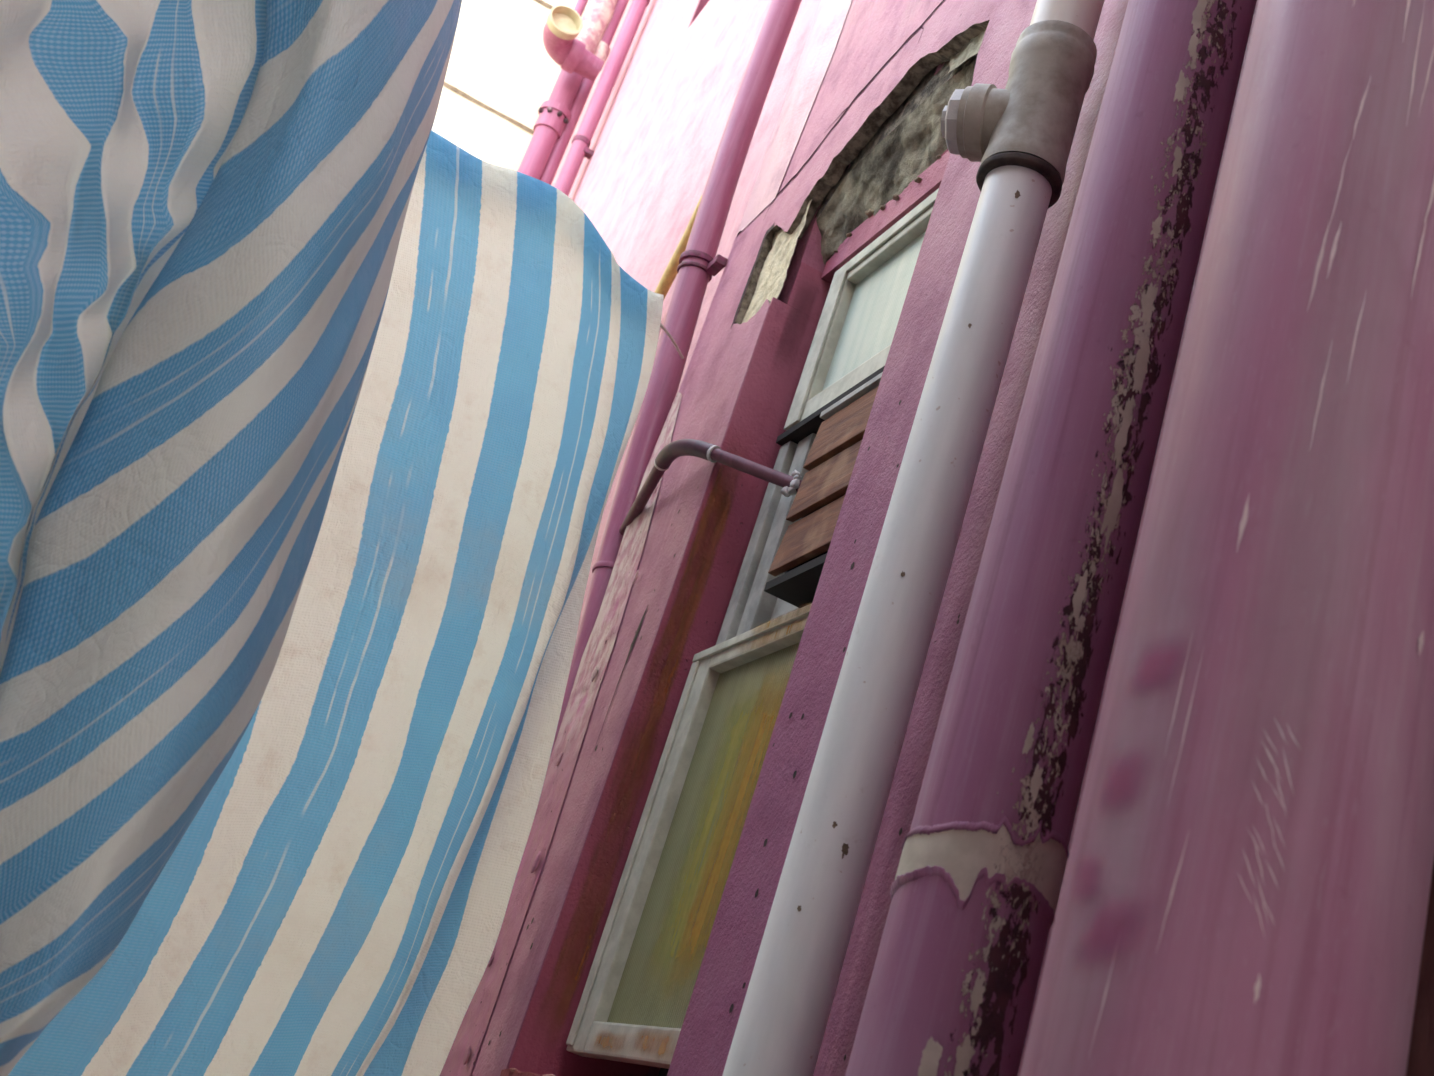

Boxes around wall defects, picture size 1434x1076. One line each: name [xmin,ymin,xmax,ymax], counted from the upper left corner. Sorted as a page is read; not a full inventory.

spalling [731,31,985,328]
peeling [890,0,1241,1076]